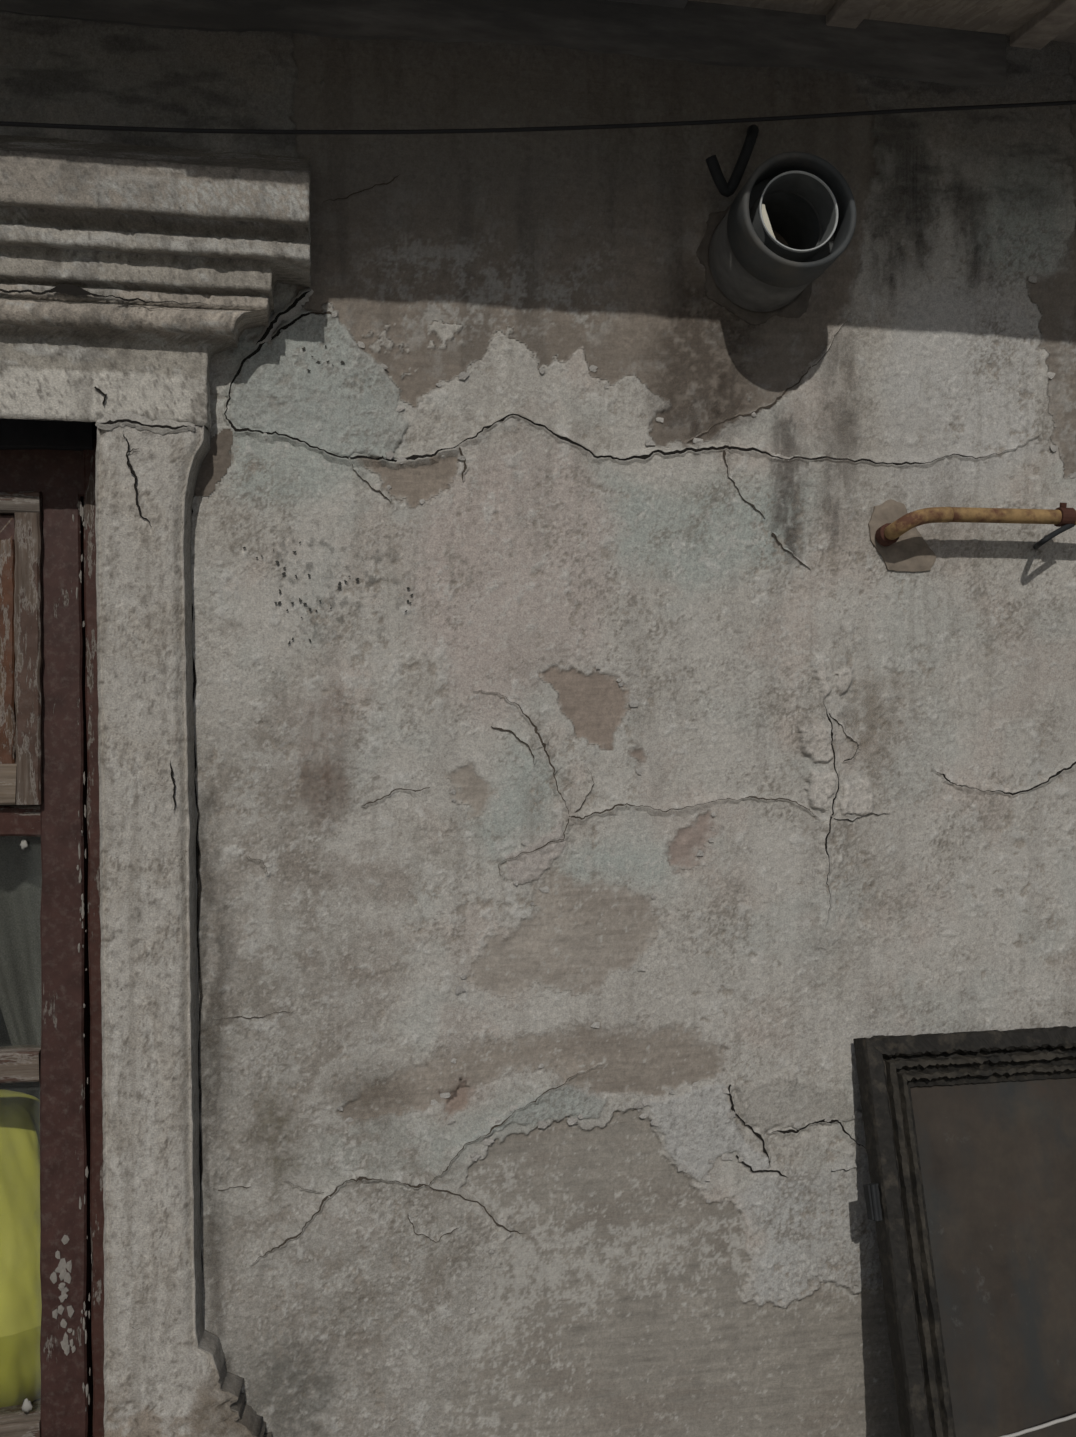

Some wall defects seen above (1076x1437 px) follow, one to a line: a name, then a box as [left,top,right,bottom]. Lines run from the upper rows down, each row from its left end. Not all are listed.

peeling [291,33,880,447]
crack [94,288,1040,569]
crack [190,604,198,702]
peeling [539,665,646,775]
crack [473,687,890,932]
crack [931,756,1076,799]
crack [170,739,602,1267]
peeling [336,1021,901,1437]
crack [728,1085,866,1178]